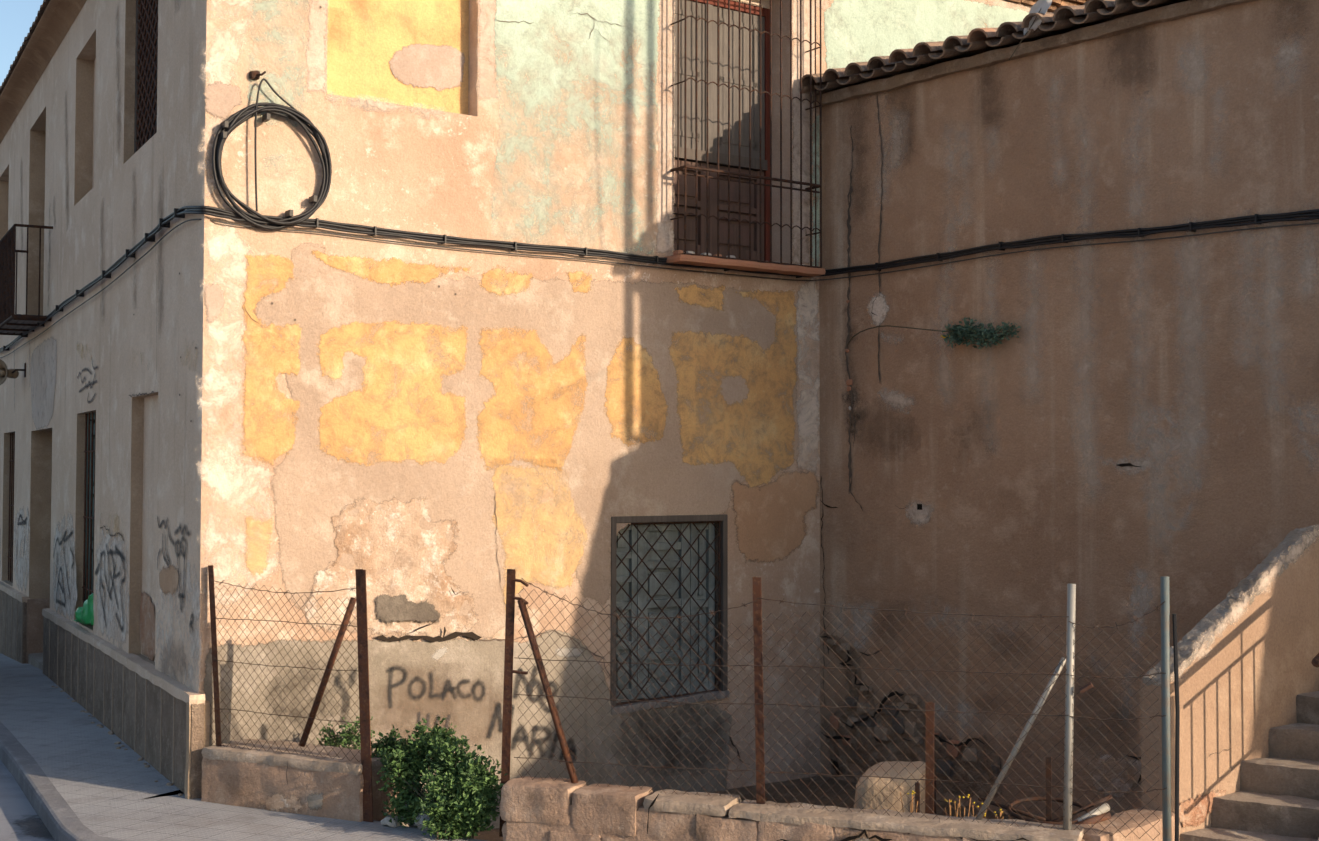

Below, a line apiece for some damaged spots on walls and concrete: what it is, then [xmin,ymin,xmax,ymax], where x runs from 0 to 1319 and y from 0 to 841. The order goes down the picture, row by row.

peeling [203,118,234,162]
peeling [204,0,282,85]
peeling [248,68,303,115]
peeling [494,0,660,250]
peeling [824,0,1029,81]
peeling [312,250,533,296]
peeling [604,116,820,487]
peeling [199,226,301,610]
peeling [316,320,588,609]
peeling [304,497,478,640]
spalling [819,633,1002,798]
spalling [840,829,892,841]